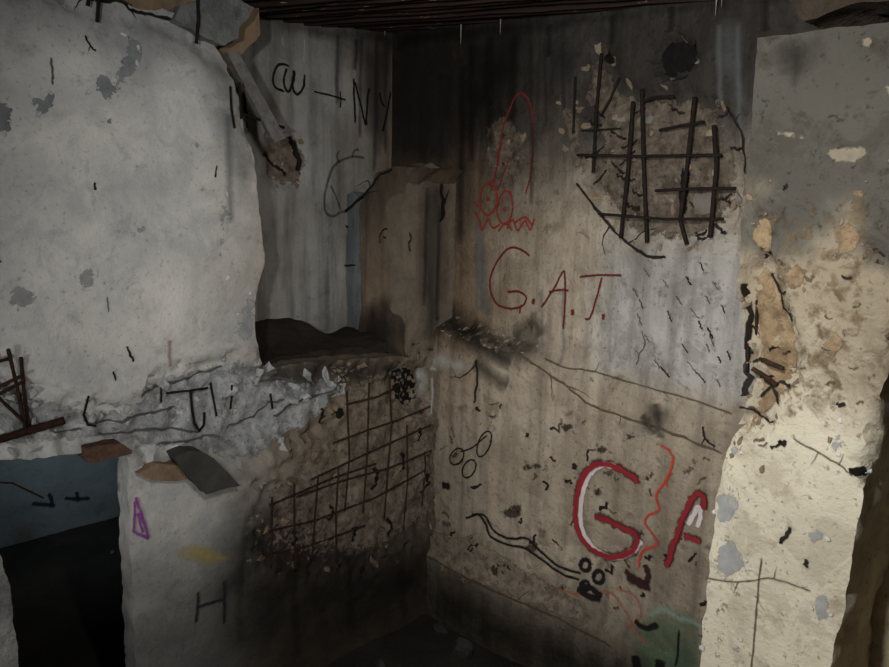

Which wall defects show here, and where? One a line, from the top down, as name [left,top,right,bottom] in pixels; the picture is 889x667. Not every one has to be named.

spalling [556,42,754,272]
flaking render [829,147,866,162]
peeling [10,287,36,311]
peeling [79,269,98,293]
spalling [676,296,731,363]
spalling [723,181,885,471]
spalling [0,348,590,628]
spalling [564,443,612,491]
flaking render [712,485,749,528]
flaking render [714,539,756,596]